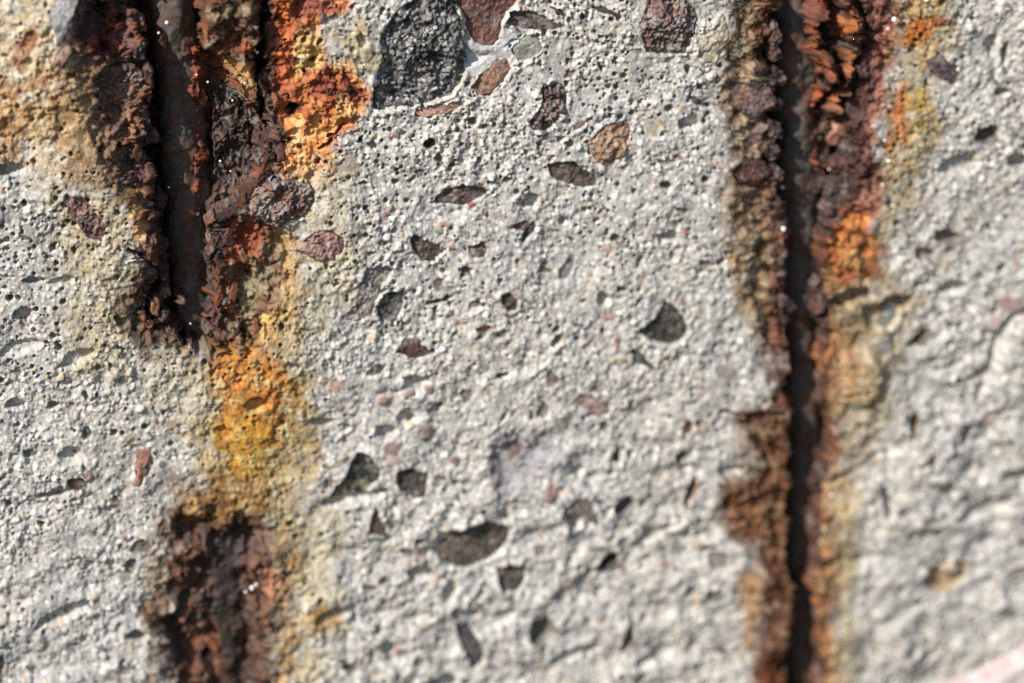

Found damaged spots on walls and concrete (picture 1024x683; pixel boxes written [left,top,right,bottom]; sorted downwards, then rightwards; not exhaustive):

rust [61,198,127,369]
spalling [62,0,373,362]
spalling [140,497,298,683]
rust [141,168,362,683]
rust [335,21,381,69]
rust [724,3,756,81]
rust [723,187,764,332]
rust [720,411,791,683]
spalling [714,0,928,683]
rust [818,236,923,683]
rust [876,0,955,216]